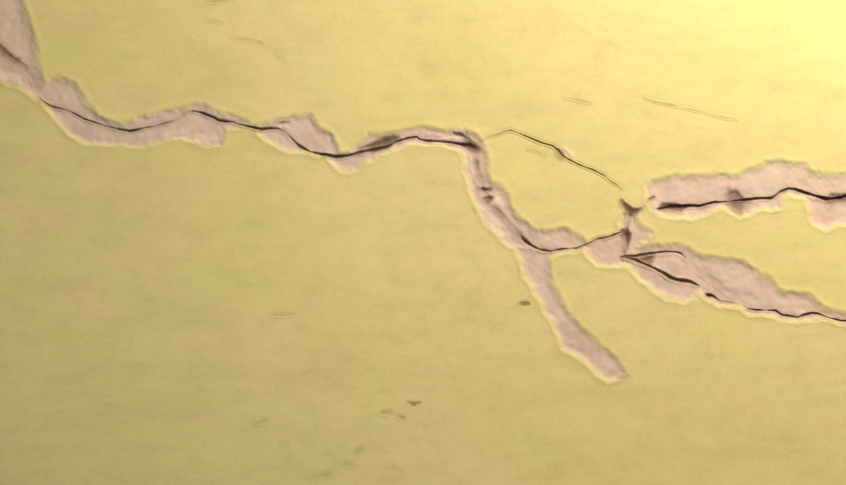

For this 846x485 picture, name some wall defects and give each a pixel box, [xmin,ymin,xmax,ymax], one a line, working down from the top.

crack [0,39,846,324]
peeling [0,0,846,386]